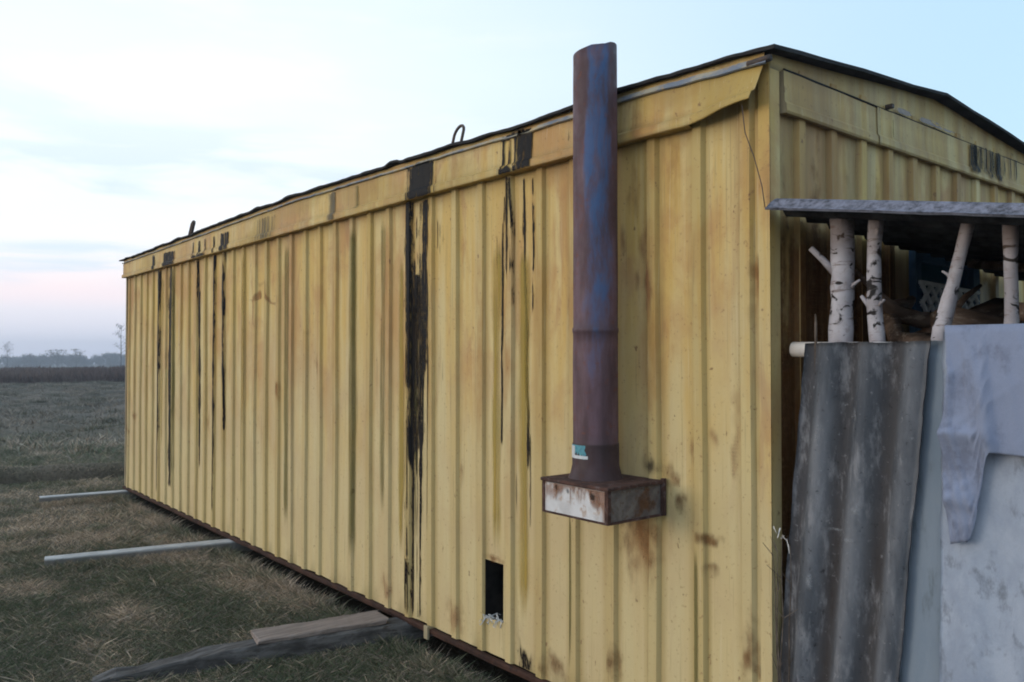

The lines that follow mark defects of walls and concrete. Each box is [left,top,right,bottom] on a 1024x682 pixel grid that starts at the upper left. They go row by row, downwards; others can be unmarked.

damp [156,267,174,486]
damp [191,239,226,498]
damp [404,183,438,614]
damp [496,128,534,509]
rust [545,482,605,517]